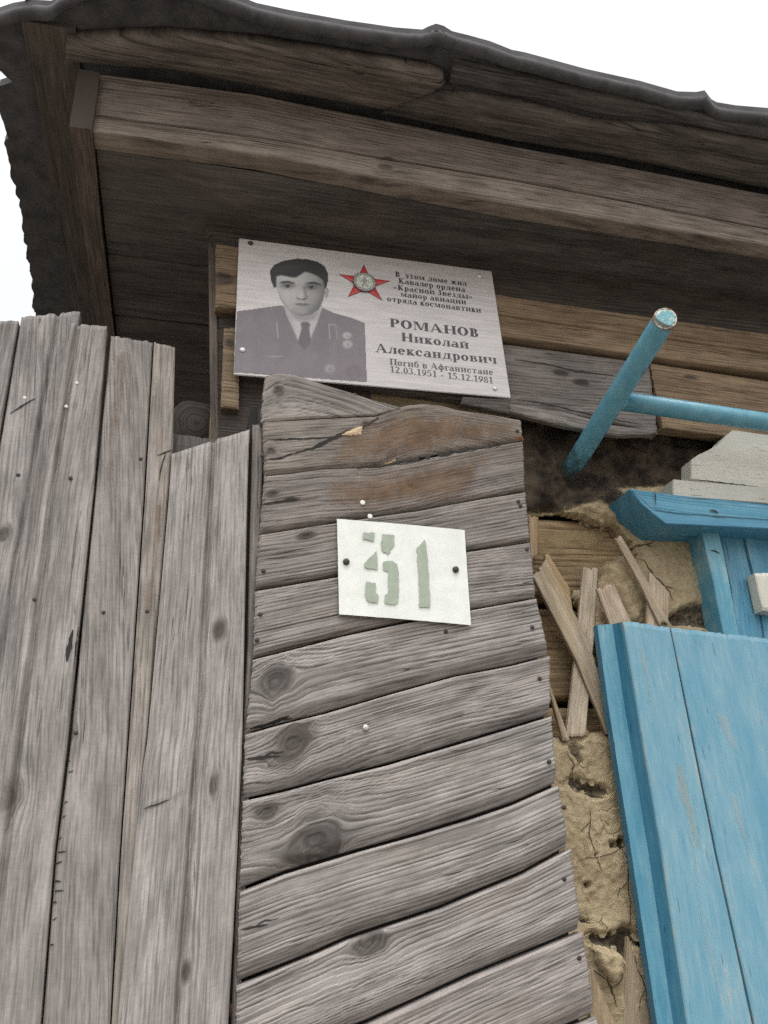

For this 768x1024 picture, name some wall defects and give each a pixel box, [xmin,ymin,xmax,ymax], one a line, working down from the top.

crack [267,417,379,460]
water stain [510,416,717,514]
crack [586,527,676,600]
spalling [668,604,705,628]
crack [577,810,631,924]
crack [595,954,647,1009]